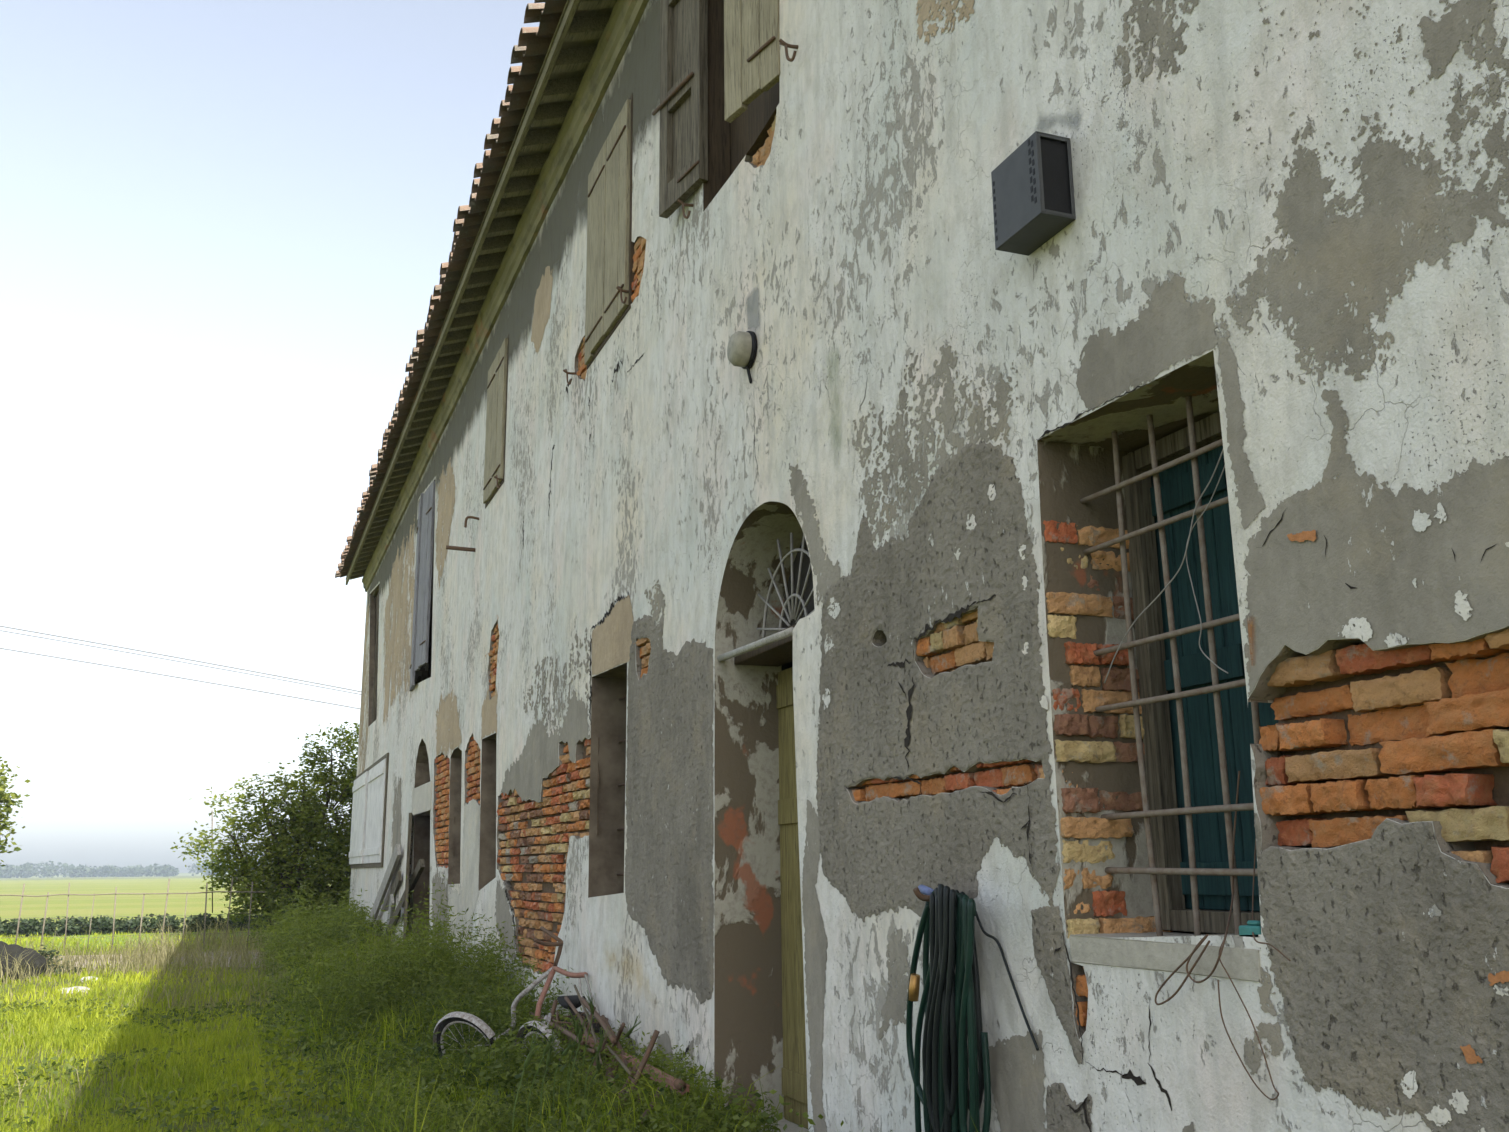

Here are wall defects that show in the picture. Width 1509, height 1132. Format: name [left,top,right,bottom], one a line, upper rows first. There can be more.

peeling [916,0,974,43]
flaking render [390,773,403,910]
flaking render [430,579,714,1005]
flaking render [789,337,1092,1132]
flaking render [1076,0,1509,1132]